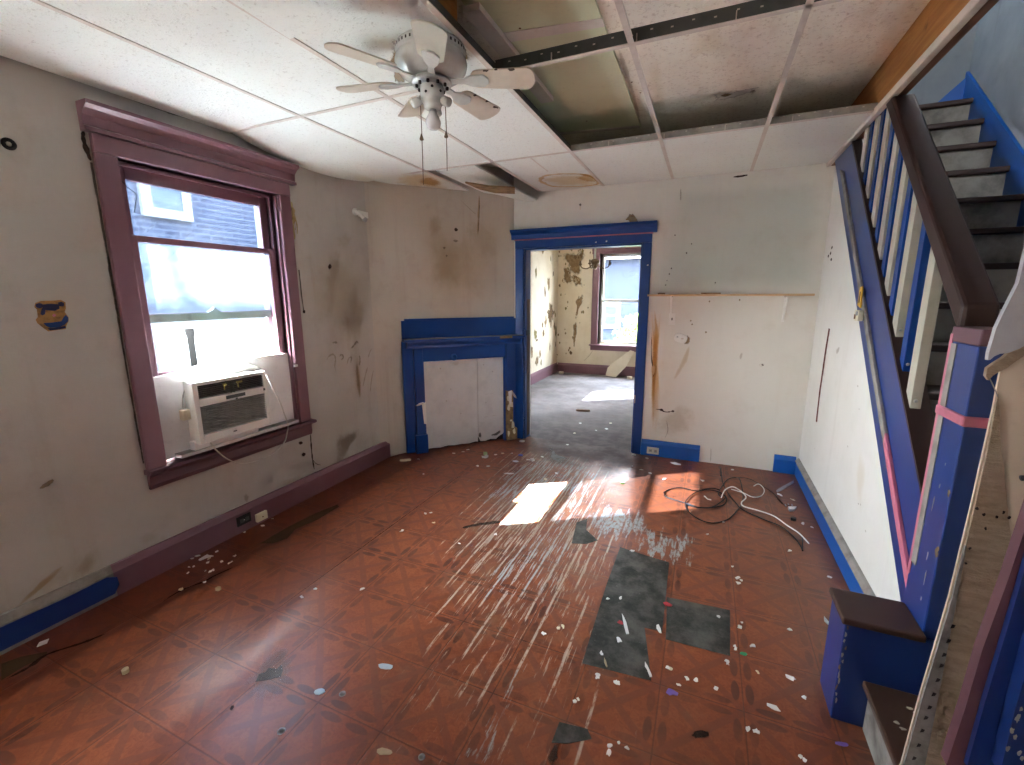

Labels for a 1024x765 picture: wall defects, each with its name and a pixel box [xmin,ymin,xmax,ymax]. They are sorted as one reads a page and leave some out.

peeling [531,251,557,365]
peeling [572,519,597,544]
peeling [582,547,730,681]